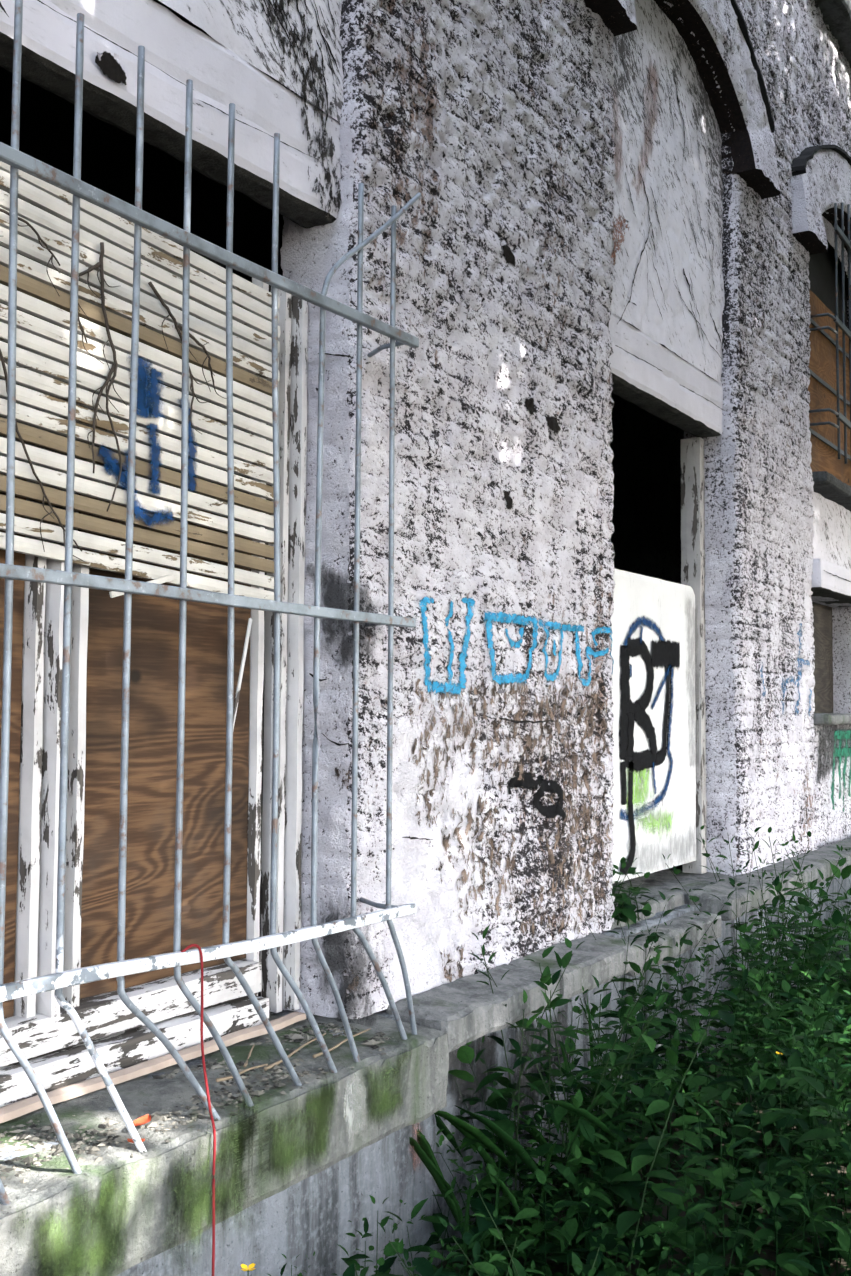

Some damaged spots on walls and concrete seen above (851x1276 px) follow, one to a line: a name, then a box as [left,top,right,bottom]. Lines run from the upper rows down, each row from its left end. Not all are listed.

leakage [366,1051,411,1121]
leakage [155,1081,336,1244]
leakage [33,1171,130,1276]